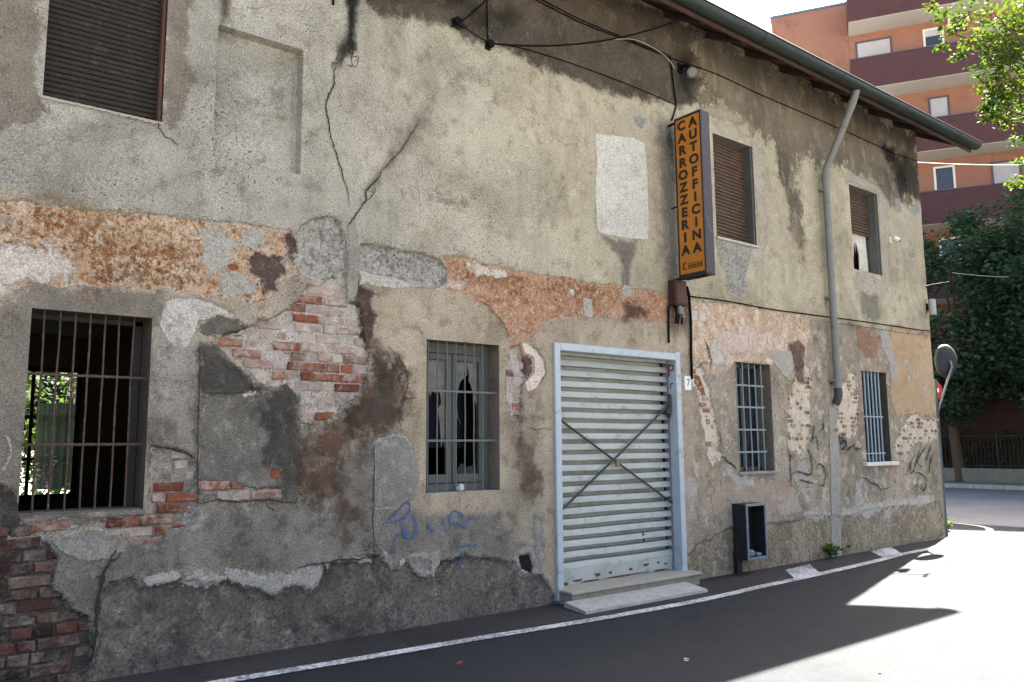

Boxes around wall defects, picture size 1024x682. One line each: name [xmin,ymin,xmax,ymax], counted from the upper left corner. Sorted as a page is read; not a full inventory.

crack [325,48,418,225]
leakage [339,0,921,246]
peeling [0,199,939,524]
flaking render [0,446,282,682]
peeling [136,560,331,597]
peeling [351,550,441,578]
spalling [514,516,544,575]